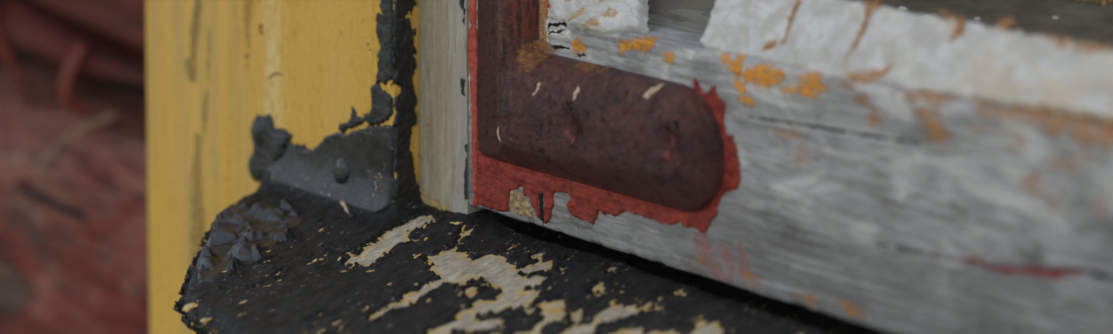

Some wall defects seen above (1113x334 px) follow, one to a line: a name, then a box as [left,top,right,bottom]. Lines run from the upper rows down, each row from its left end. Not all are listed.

rust [516,0,556,72]
rust [565,0,616,73]
rust [619,37,675,63]
peeling [248,114,307,182]
peeling [338,0,741,334]
peeling [182,300,212,326]